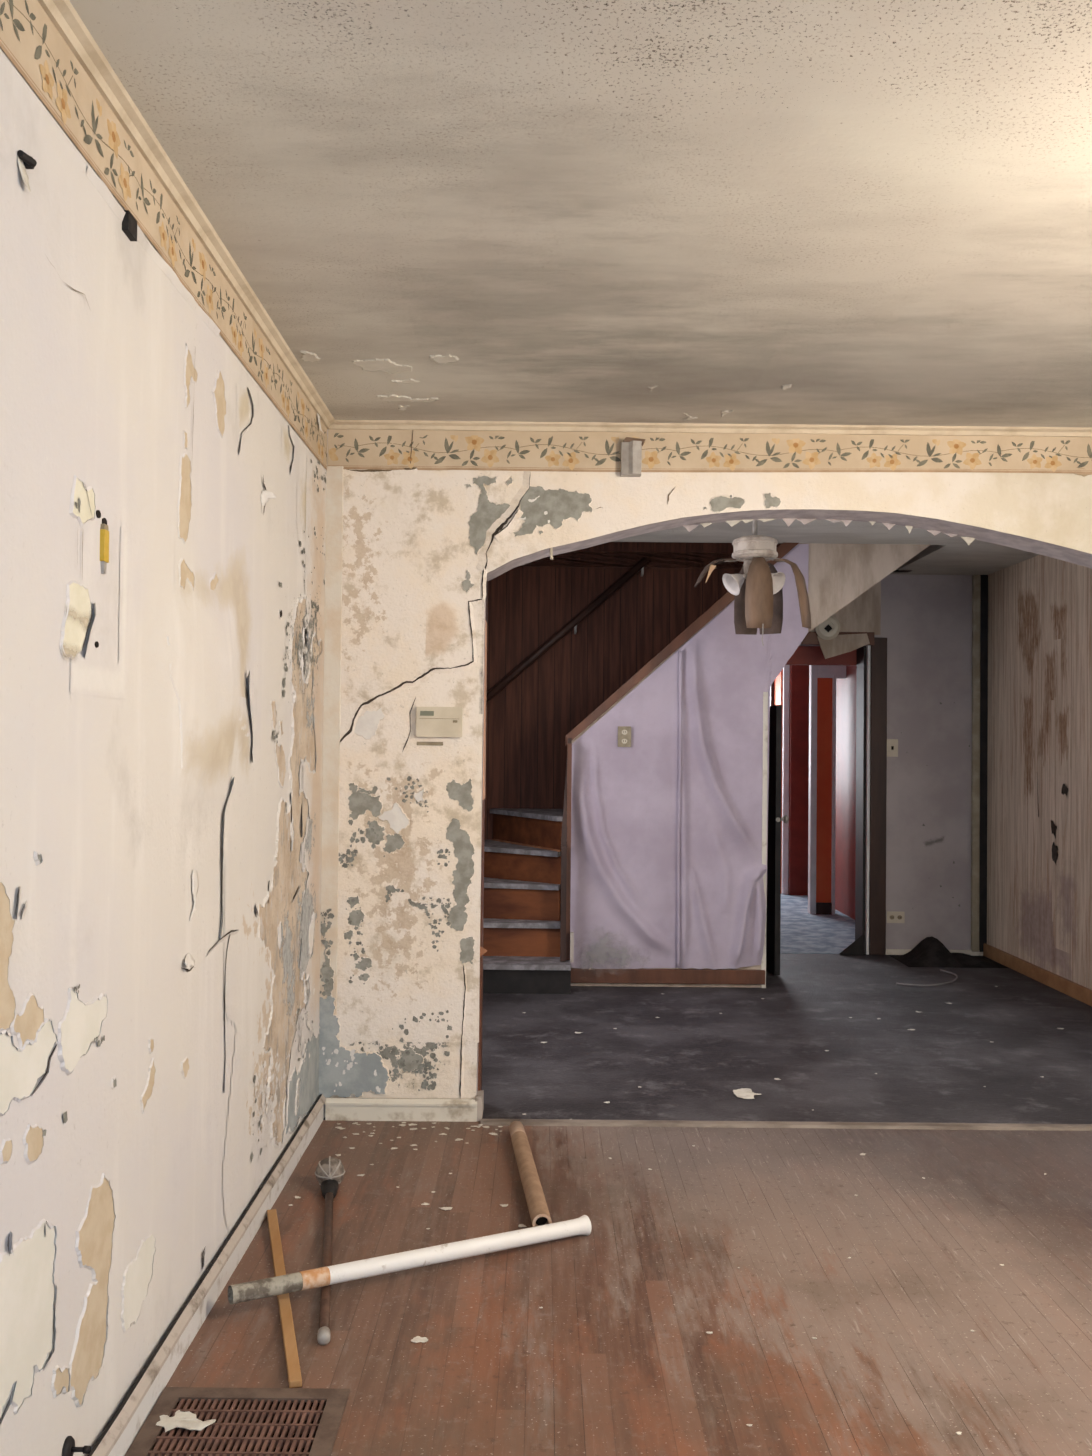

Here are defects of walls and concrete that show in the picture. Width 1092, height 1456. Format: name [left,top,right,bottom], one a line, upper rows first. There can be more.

peeling [183,343,226,438]
peeling [177,430,219,592]
crack [340,471,530,746]
peeling [461,475,593,593]
peeling [0,881,44,1049]
crack [207,671,253,1093]
peeling [222,473,483,1232]
peeling [0,1124,47,1165]
peeling [140,1037,156,1114]
peeling [51,1173,116,1407]